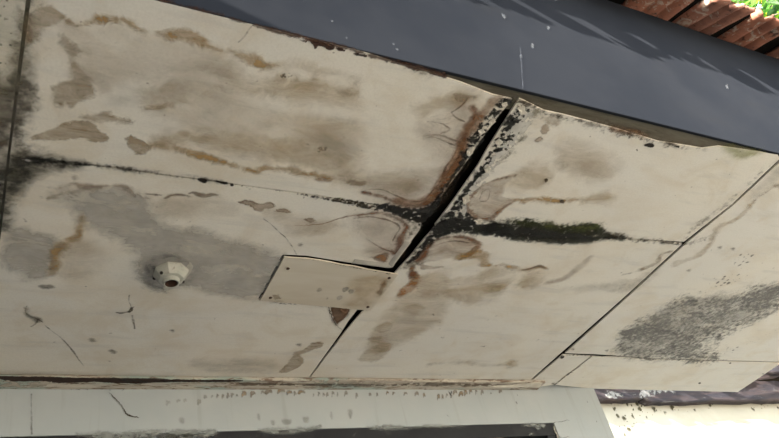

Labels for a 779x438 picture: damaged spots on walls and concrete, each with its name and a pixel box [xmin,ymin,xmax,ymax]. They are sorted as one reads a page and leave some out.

leakage [0,77,27,149]
leakage [0,154,111,213]
leakage [127,135,148,154]
leakage [187,151,231,165]
leakage [50,226,82,270]
leakage [297,193,498,266]
mould [618,285,779,364]
peeling [239,380,542,388]